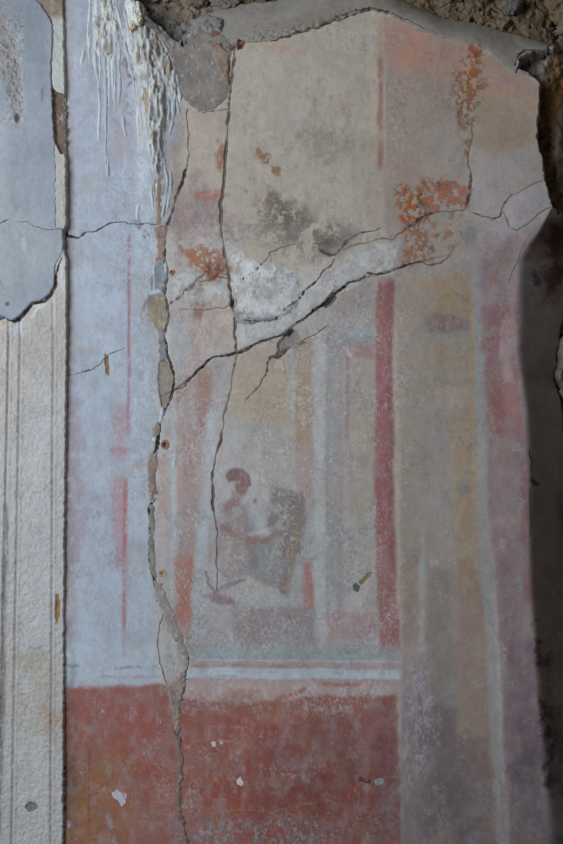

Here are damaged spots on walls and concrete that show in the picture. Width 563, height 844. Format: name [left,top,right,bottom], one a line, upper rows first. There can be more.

crack [271,7,438,42]
spalling [51,85,68,154]
damp [80,0,183,224]
crack [472,177,554,231]
crack [0,46,472,844]
crack [529,449,541,537]